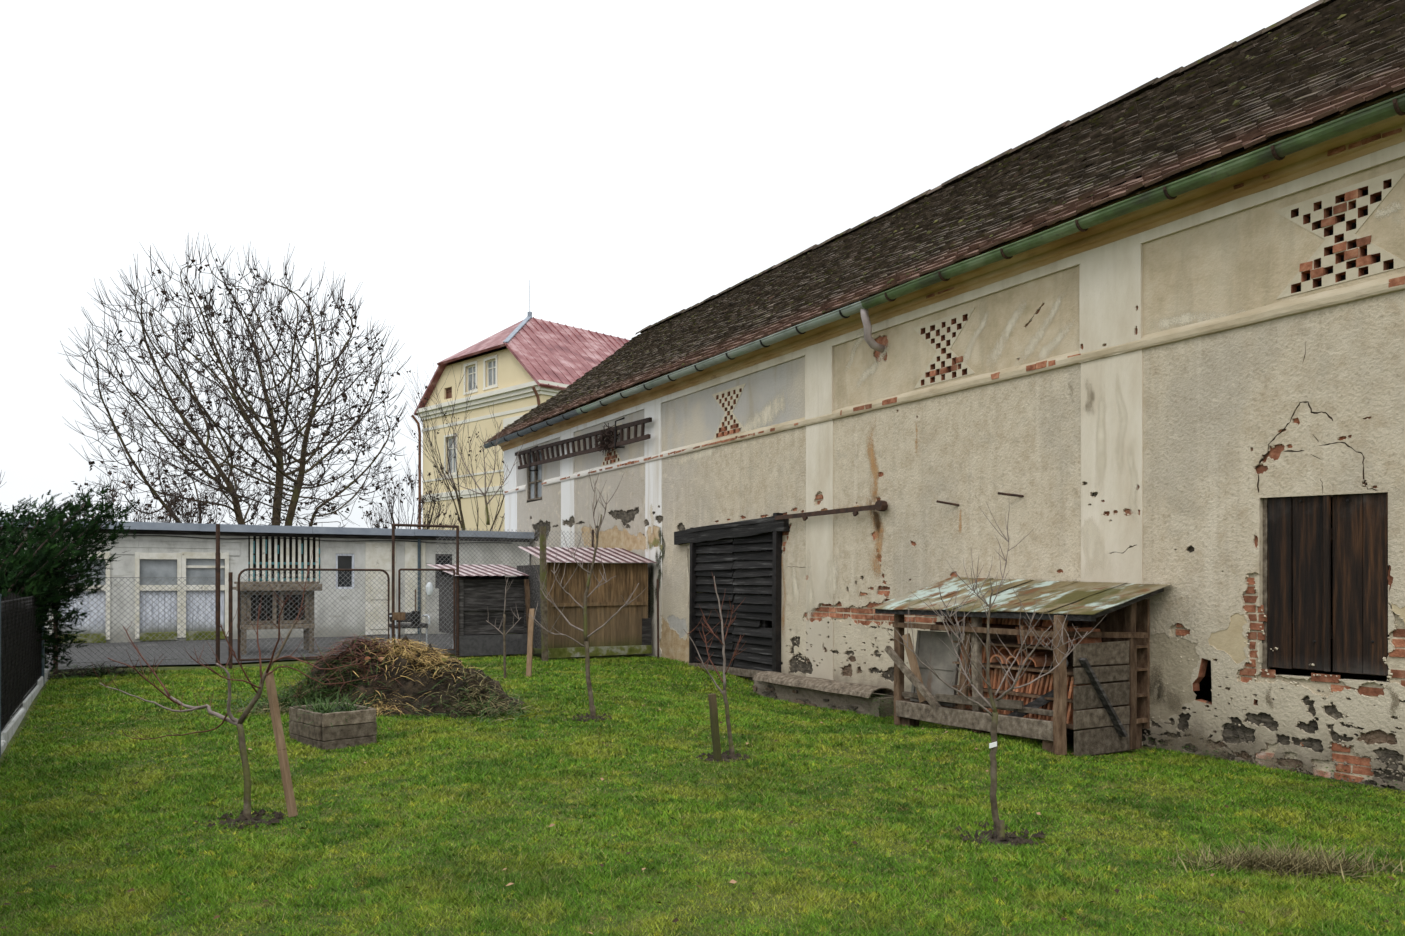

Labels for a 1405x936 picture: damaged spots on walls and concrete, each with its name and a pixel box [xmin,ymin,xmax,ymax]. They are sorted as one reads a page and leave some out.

rust [794,414,886,579]
crack [1255,401,1377,493]
spalling [782,531,938,682]
spalling [1142,565,1405,790]